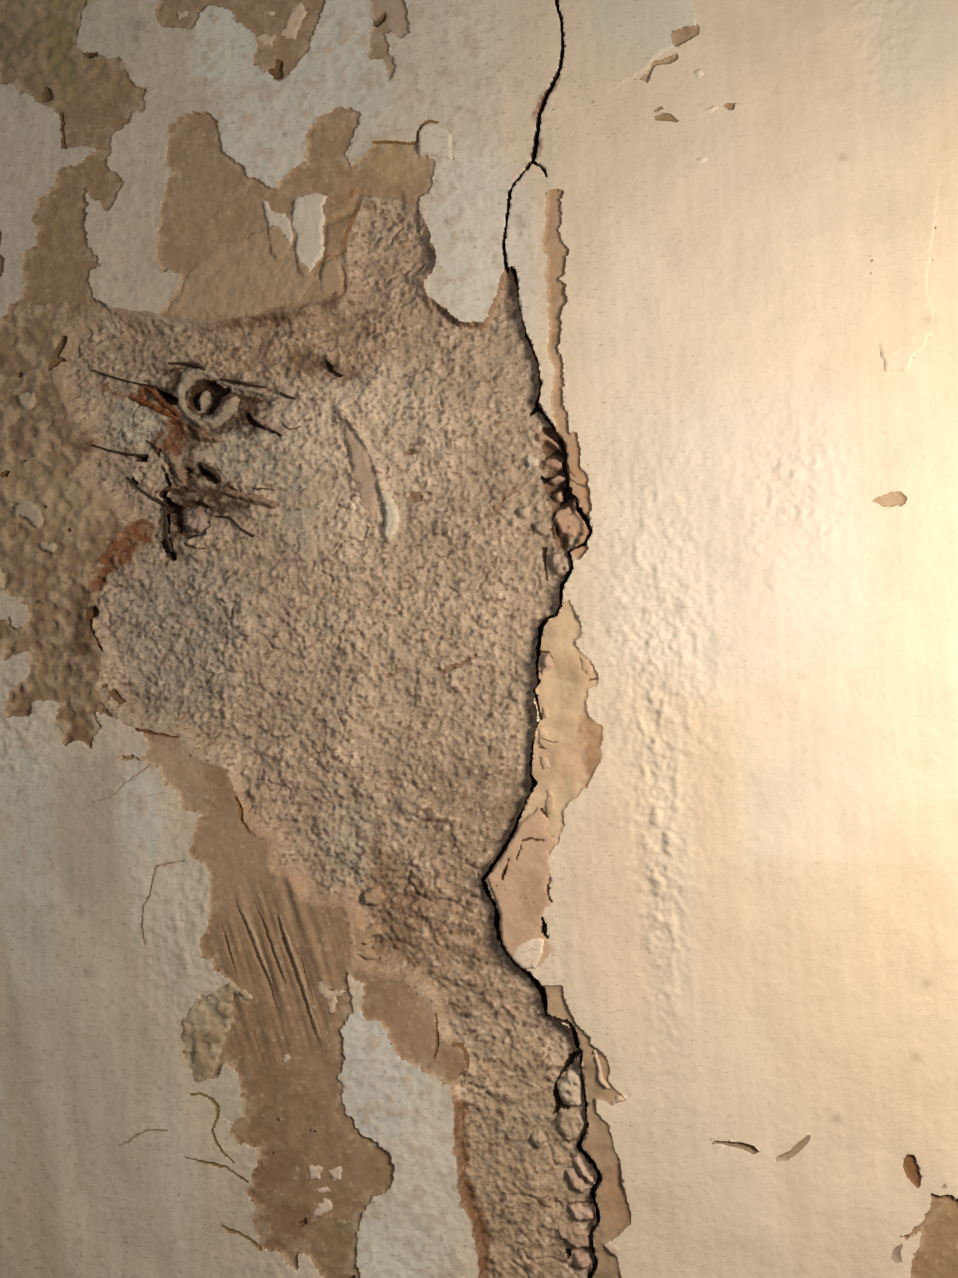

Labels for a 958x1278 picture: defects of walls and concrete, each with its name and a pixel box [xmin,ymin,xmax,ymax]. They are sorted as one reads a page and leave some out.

peeling [640,24,700,83]
peeling [655,106,679,122]
corrosion [130,386,192,455]
corrosion [91,519,153,590]
flaking render [0,0,631,1278]
crack [481,0,603,1278]
peeling [891,1154,958,1278]